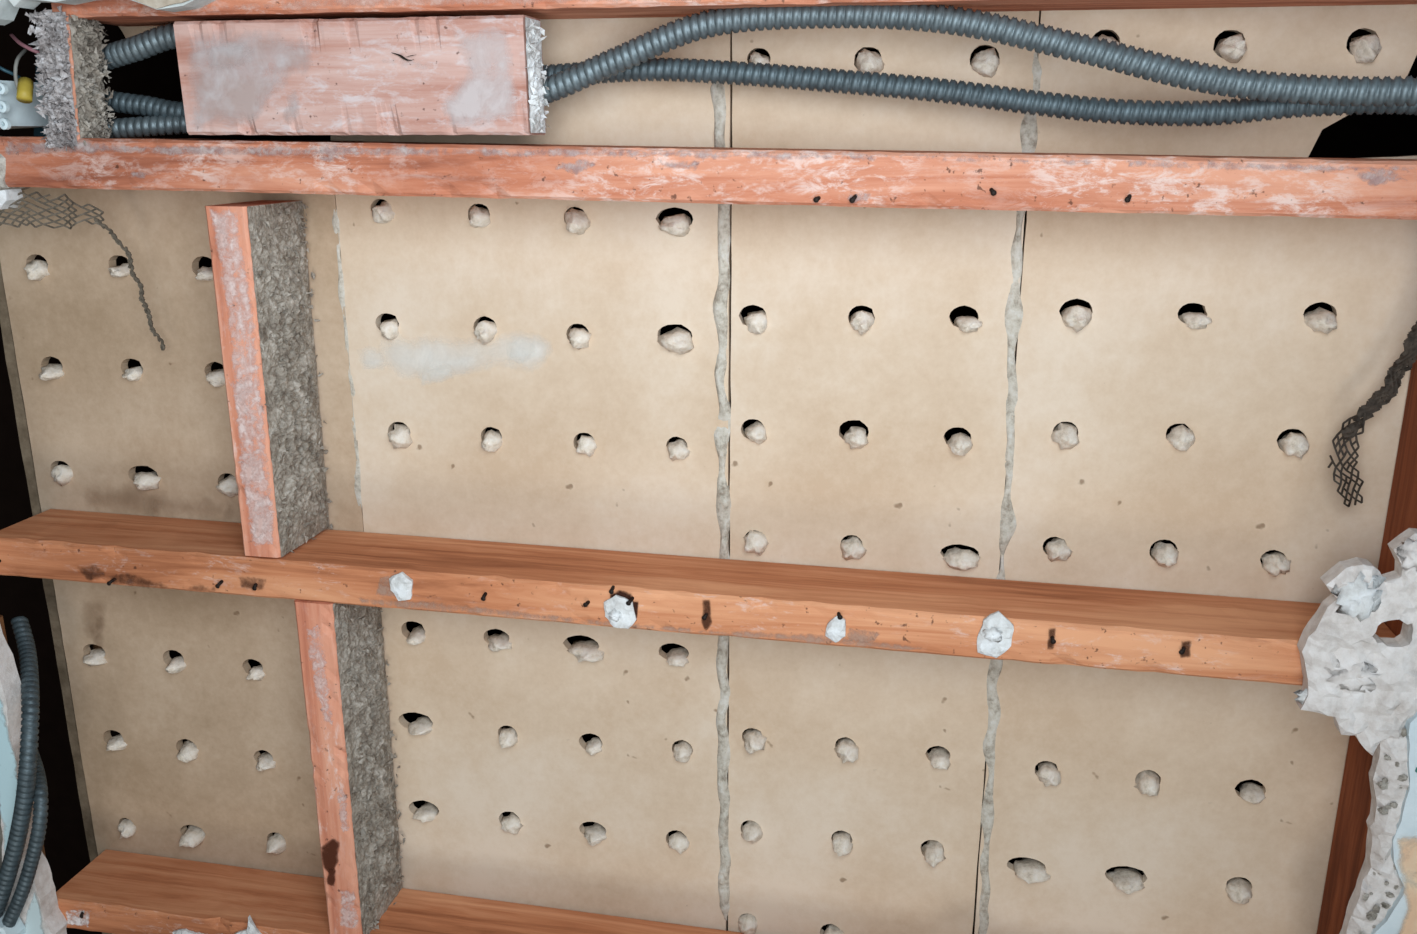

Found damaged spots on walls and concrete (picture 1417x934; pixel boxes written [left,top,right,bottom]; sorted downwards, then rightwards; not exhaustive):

peeling [0,6,138,209]
peeling [248,146,430,160]
peeling [550,150,594,174]
flaking render [1293,528,1417,934]